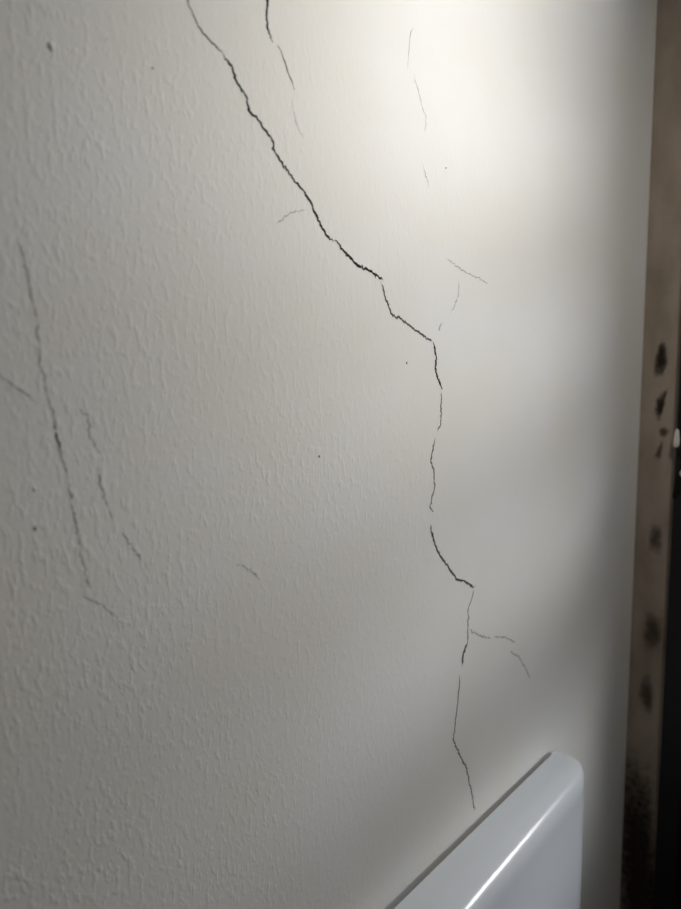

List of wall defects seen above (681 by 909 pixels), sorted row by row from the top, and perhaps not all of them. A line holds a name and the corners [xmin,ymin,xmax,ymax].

crack [187,0,475,810]